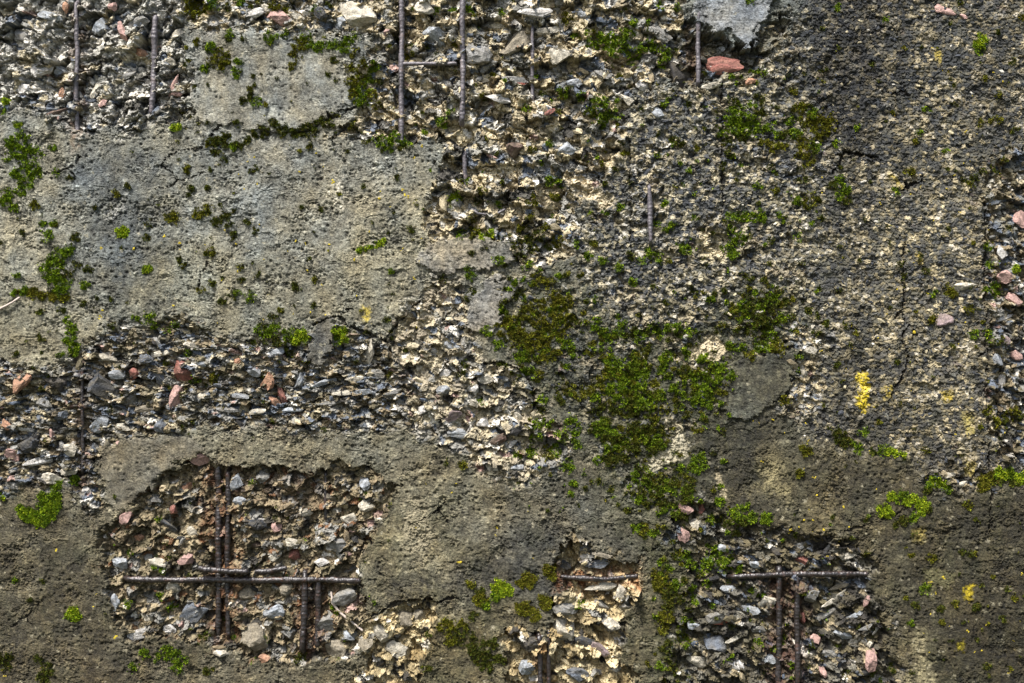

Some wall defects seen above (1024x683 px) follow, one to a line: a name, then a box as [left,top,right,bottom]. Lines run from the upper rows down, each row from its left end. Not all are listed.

corrosion [61,0,97,150]
spalling [0,0,792,683]
corrosion [190,457,336,658]
corrosion [284,565,345,665]
spalling [660,452,907,683]
corrosion [756,569,818,683]